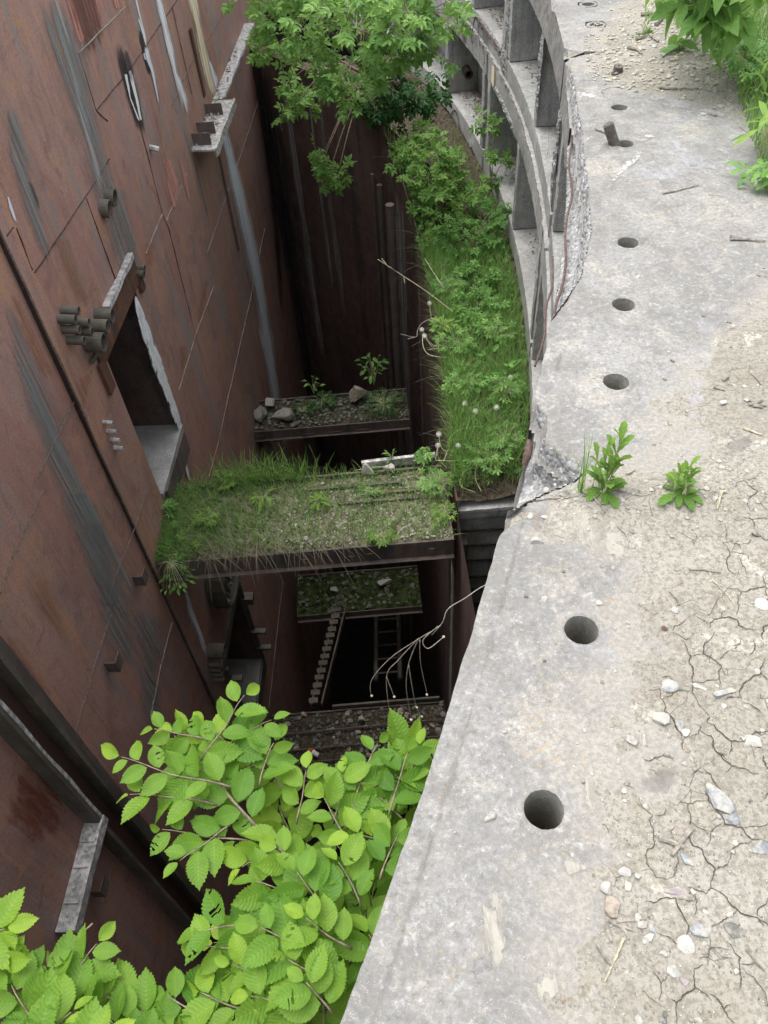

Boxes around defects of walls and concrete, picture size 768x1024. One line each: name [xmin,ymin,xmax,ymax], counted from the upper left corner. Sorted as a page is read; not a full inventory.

spalling [534,59,592,367]
spalling [506,405,583,518]